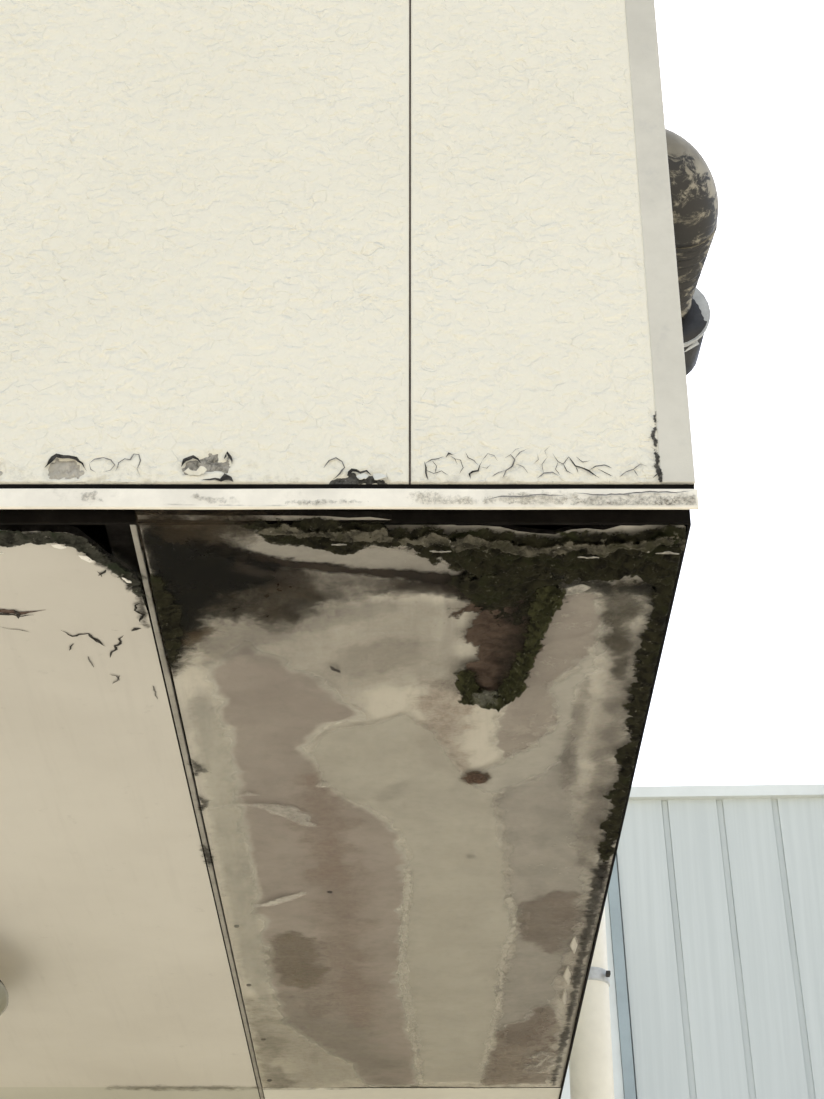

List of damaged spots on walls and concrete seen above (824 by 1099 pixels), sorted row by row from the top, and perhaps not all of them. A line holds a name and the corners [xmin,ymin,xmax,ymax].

spalling [45,453,86,480]
spalling [181,451,233,482]
spalling [324,457,387,485]
crack [424,414,663,482]
crack [0,609,43,632]
crack [61,604,145,684]
water stain [91,509,475,677]
water stain [205,544,681,1086]